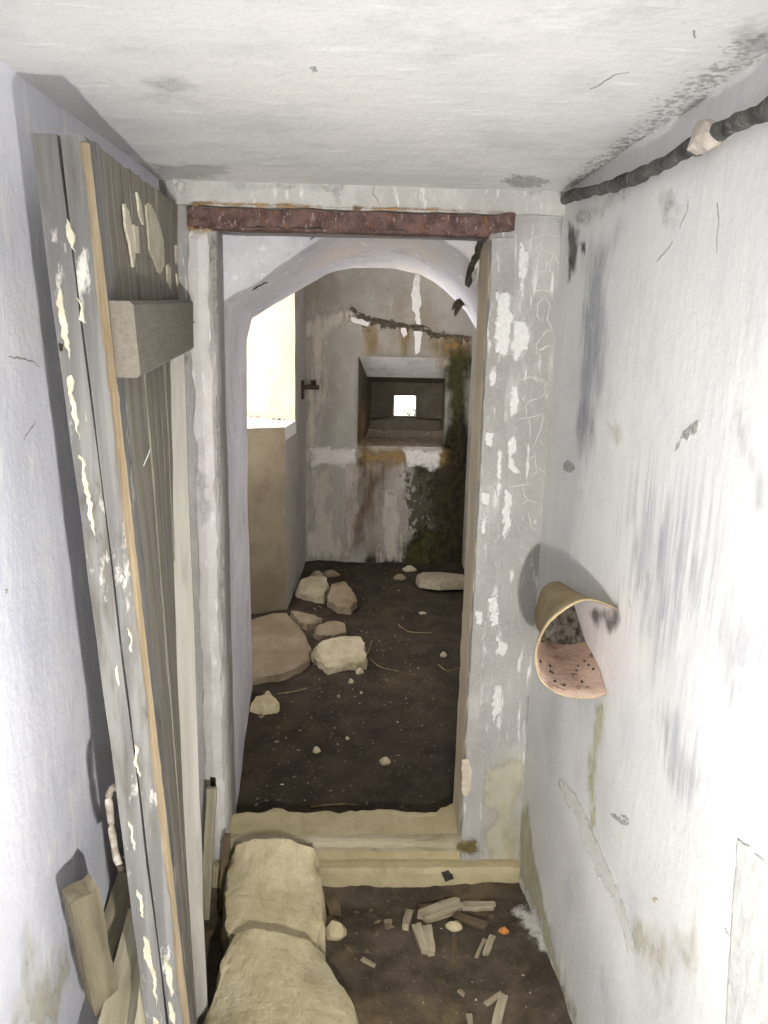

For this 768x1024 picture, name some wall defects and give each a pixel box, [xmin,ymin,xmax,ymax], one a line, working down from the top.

peeling [122,192,179,292]
rust [192,201,319,209]
peeling [493,242,531,362]
peeling [509,386,520,417]
spalling [675,420,700,452]
leakage [341,464,362,554]
leakage [401,414,468,564]
peeling [481,432,520,539]
peeling [475,595,508,657]
peeling [491,685,502,722]